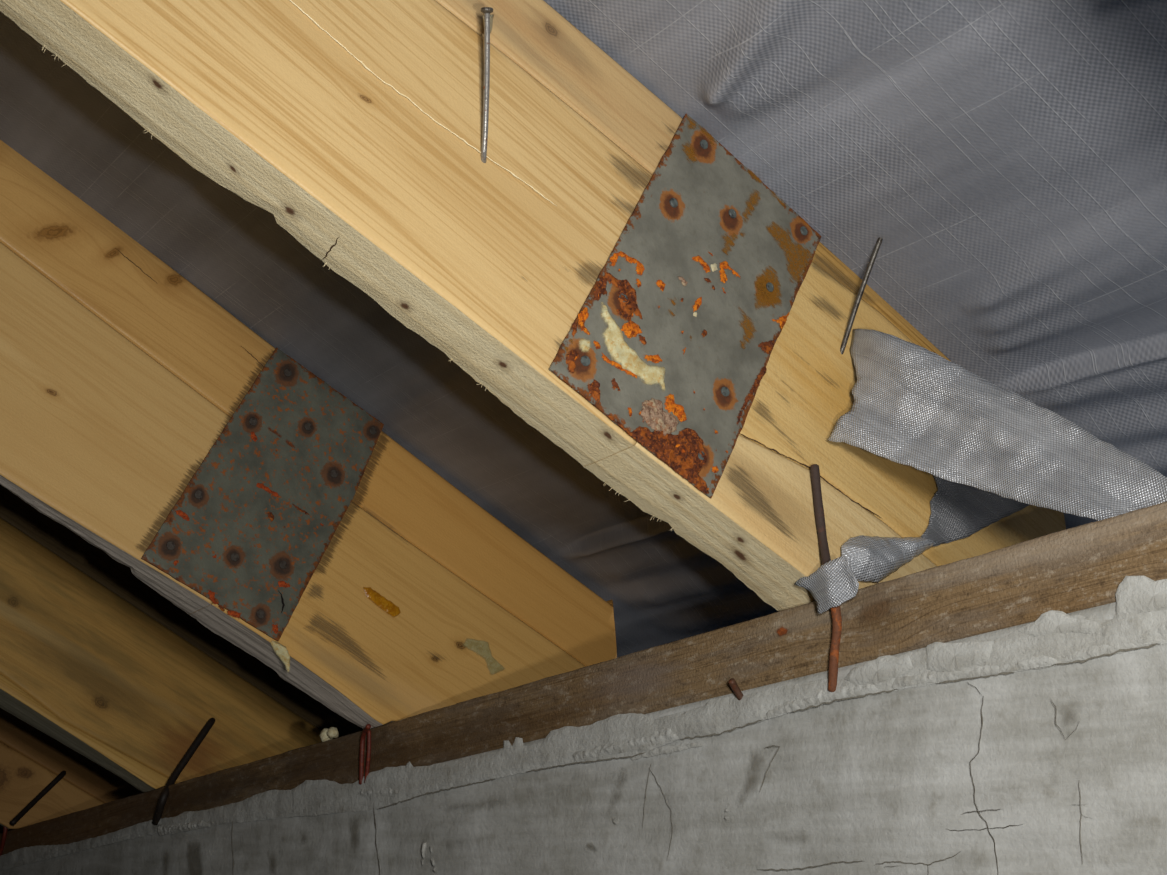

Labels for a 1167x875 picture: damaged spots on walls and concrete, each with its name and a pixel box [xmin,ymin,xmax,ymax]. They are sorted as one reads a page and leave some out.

corrosion [656,170,785,317]
corrosion [565,251,662,403]
corrosion [737,222,812,426]
corrosion [607,394,728,494]
corrosion [208,590,241,618]
crack [1052,643,1158,666]
crack [373,778,496,875]
crack [527,752,673,857]
crack [681,720,780,790]
crack [756,672,1019,873]